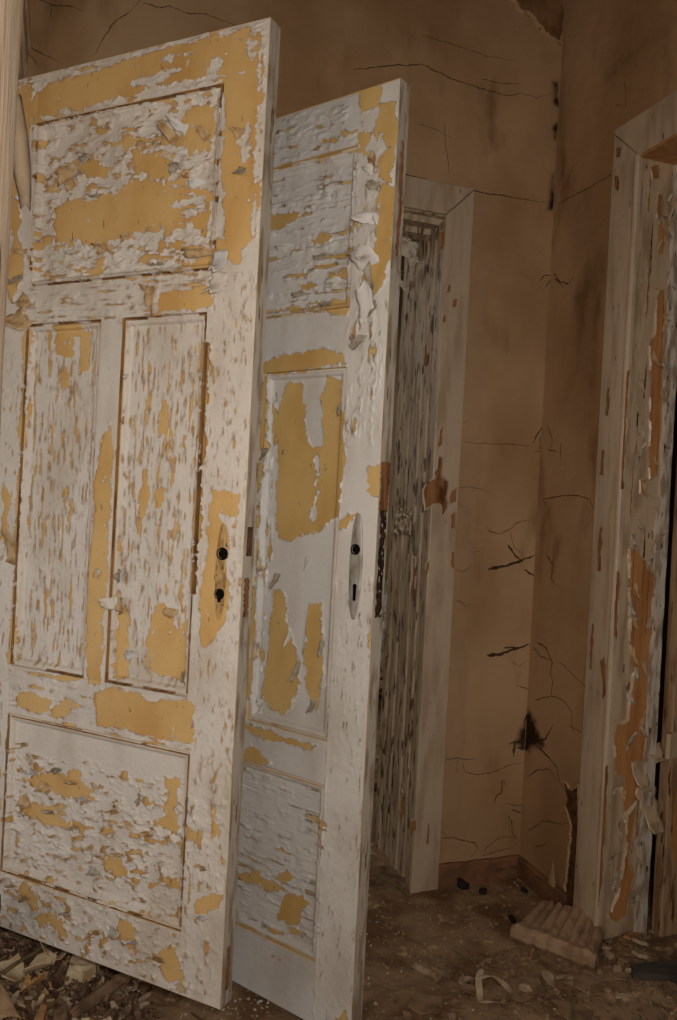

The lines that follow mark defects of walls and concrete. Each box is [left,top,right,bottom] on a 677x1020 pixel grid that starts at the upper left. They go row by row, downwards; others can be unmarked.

crack [97,0,234,50]
crack [354,35,541,98]
peeling [5,292,33,331]
peeling [346,243,380,350]
peeling [422,425,457,530]
crack [455,494,594,572]
peeling [597,164,677,922]
peeling [243,578,254,617]
crack [513,643,585,732]
spalling [510,713,553,757]
crack [441,743,569,857]
peeling [20,942,67,992]